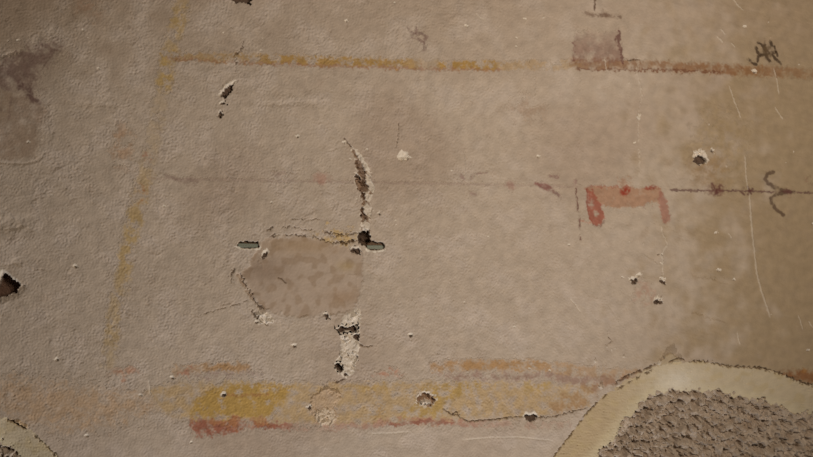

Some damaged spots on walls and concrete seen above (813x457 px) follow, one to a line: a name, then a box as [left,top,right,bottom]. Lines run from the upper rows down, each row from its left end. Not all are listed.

flaking render [250,308,274,326]
crack [334,308,373,384]
crack [442,357,813,457]